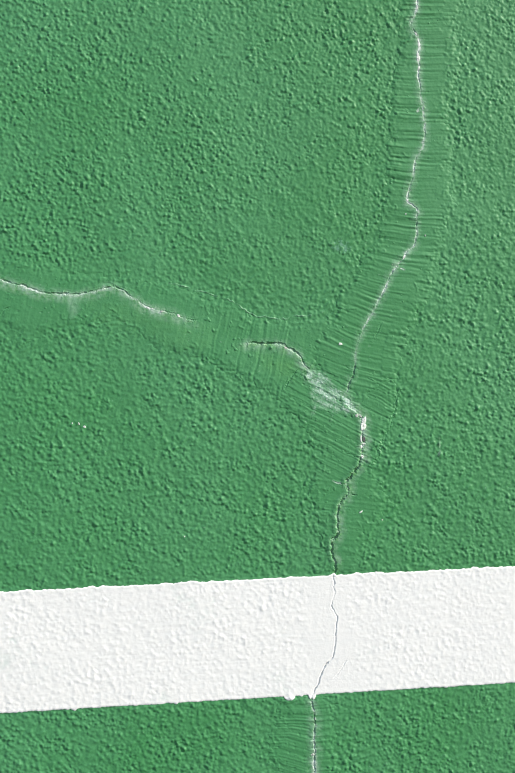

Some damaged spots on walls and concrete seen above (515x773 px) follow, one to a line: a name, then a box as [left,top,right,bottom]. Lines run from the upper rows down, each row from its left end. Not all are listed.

crack [0,272,200,329]
crack [236,335,317,378]
crack [303,0,432,773]